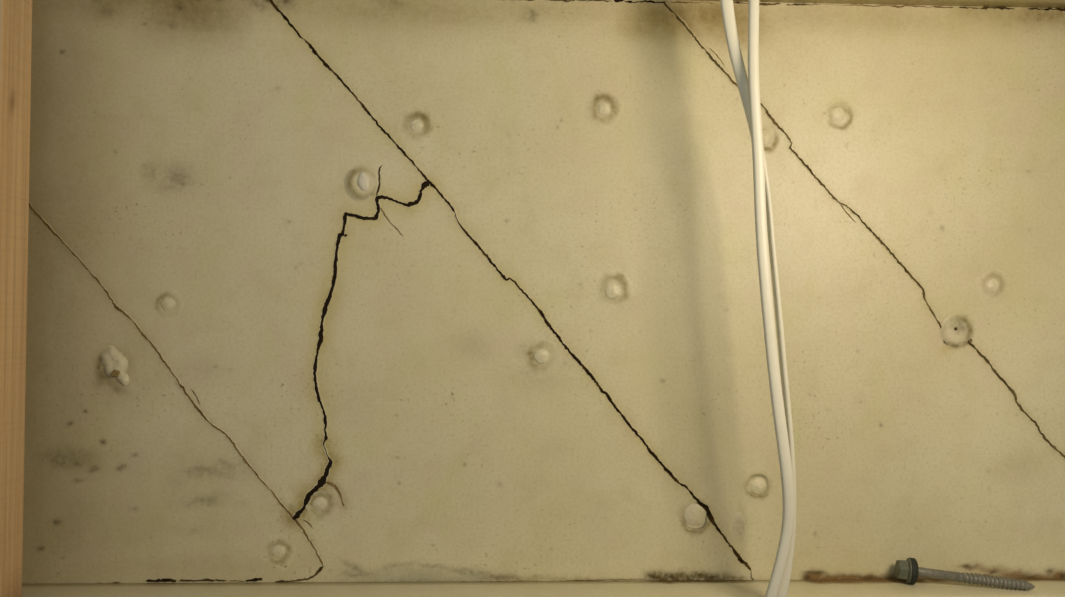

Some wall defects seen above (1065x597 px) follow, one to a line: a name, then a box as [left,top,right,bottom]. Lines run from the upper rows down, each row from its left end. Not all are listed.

crack [527,0,1065,90]
crack [760,102,942,328]
crack [29,0,754,582]
crack [967,340,1065,459]
crack [560,576,642,584]
corrosion [804,572,940,583]
corrosion [985,572,1065,580]